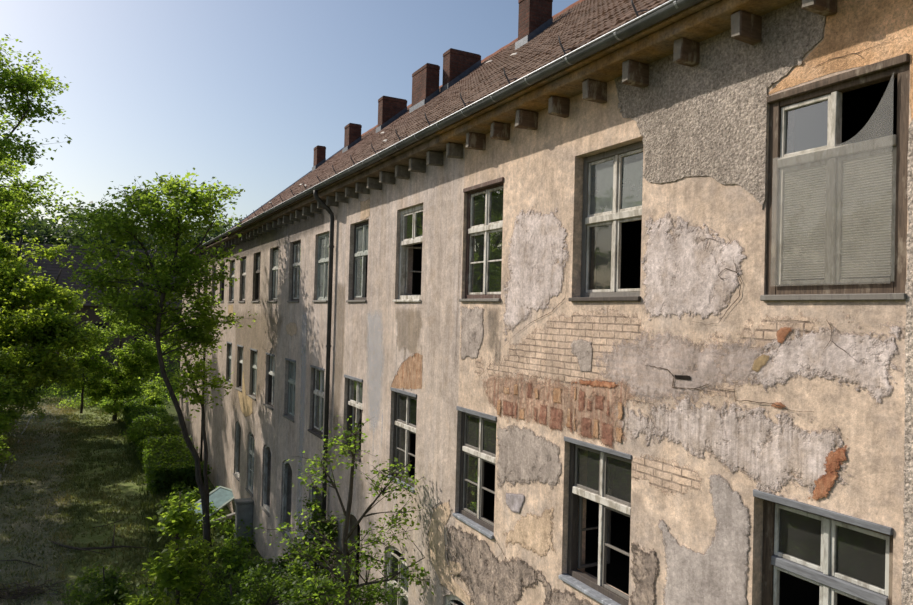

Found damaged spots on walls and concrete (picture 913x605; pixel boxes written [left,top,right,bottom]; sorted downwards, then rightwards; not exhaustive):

flaking render [768,0,913,121]
crack [813,38,898,68]
peeling [391,353,423,390]
peeling [474,204,904,501]
crack [645,365,812,412]
flaking render [427,498,593,605]
flaking render [630,542,660,605]